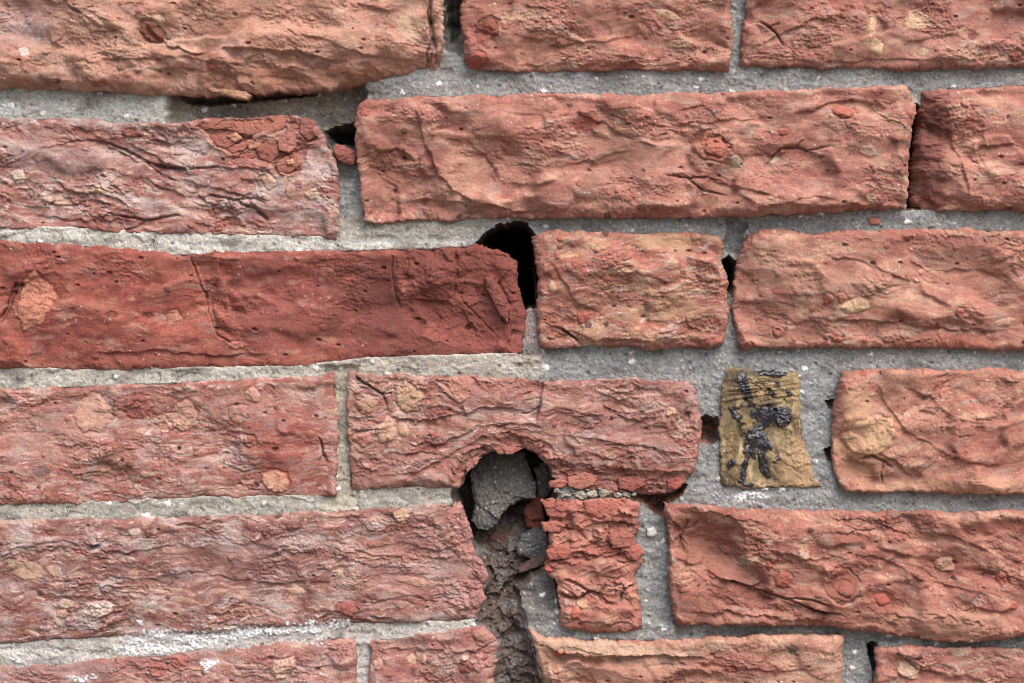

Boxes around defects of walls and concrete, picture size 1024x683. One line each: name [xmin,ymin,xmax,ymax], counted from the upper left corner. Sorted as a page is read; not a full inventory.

spalling [392,243,527,354]
spalling [442,432,695,683]